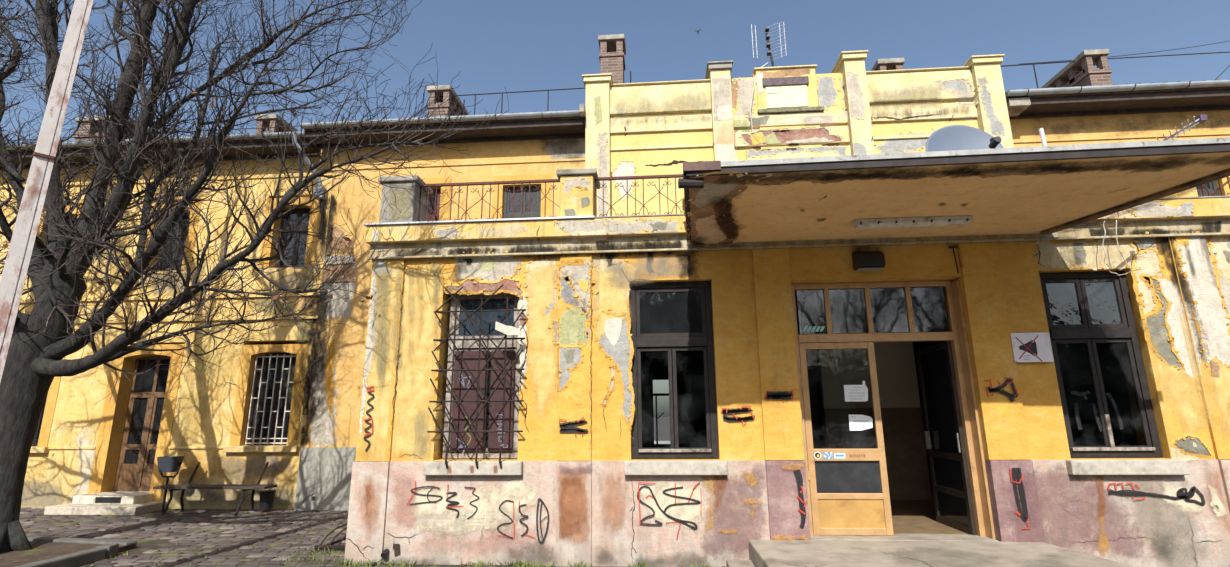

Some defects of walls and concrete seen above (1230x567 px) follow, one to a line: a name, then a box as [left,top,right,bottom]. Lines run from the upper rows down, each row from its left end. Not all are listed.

leakage [322,195,337,257]
flaking render [321,226,357,320]
leakage [714,199,739,239]
peeling [359,68,1184,460]
leakage [719,157,1230,184]
leakage [255,268,328,446]
peeling [310,339,338,448]
peeling [1035,197,1230,461]